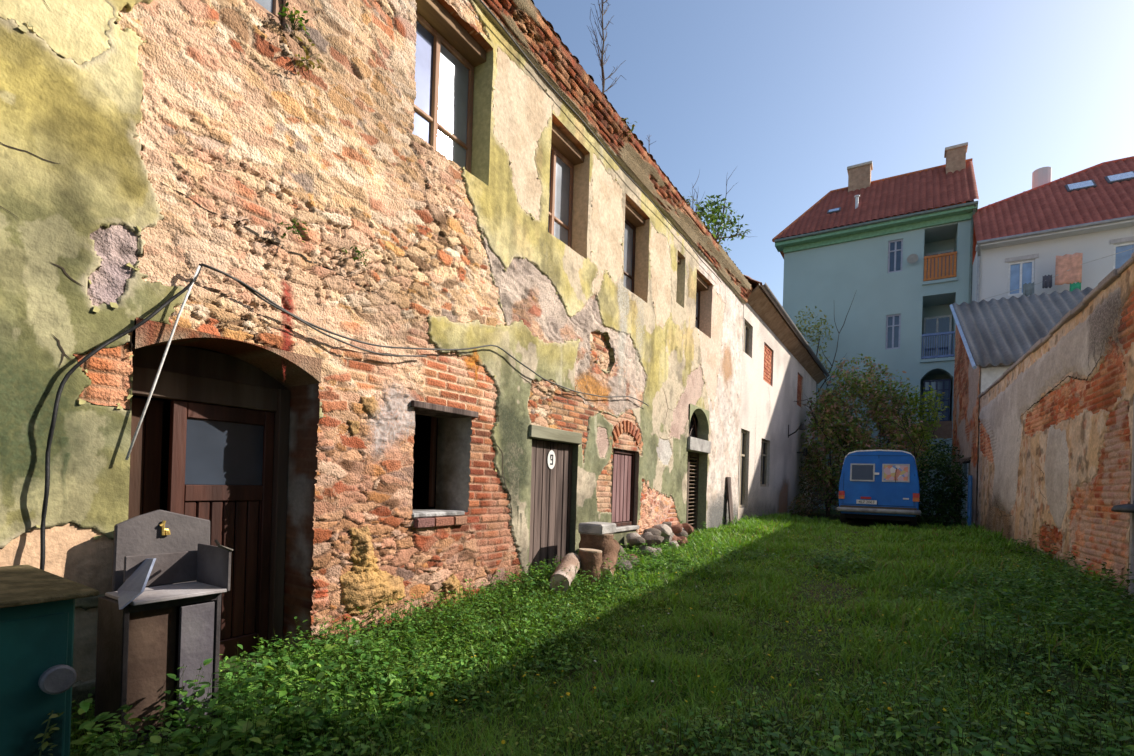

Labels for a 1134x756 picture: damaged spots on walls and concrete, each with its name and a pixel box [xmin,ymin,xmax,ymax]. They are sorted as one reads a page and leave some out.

crack [0,142,60,164]
flaking render [0,0,647,652]
water stain [617,281,644,393]
peeling [649,223,671,330]
peeling [657,285,725,466]
water stain [723,351,731,378]
flaking render [978,285,1134,589]
flaking render [636,479,681,546]